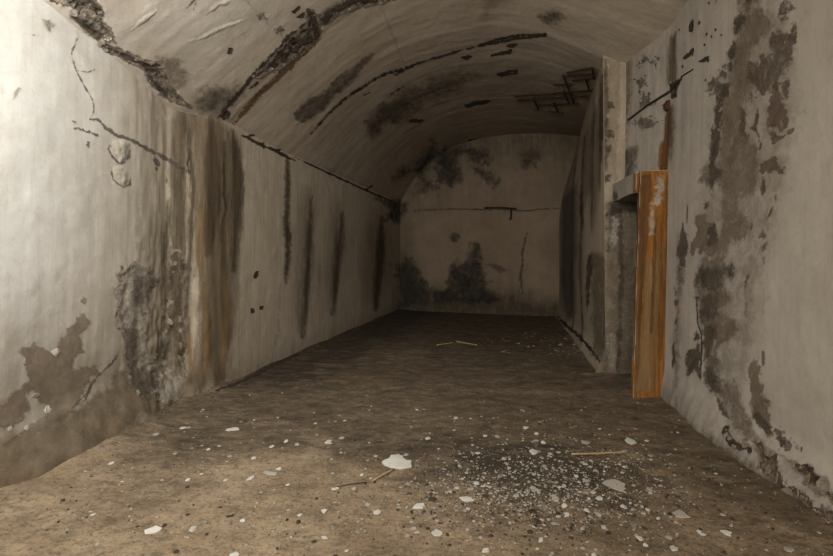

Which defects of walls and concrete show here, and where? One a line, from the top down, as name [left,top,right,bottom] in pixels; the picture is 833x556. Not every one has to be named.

spalling [50,0,193,109]
crack [71,40,190,183]
spalling [252,0,396,79]
spalling [477,33,547,57]
damp [161,89,243,389]
crack [219,155,227,241]
damp [283,160,291,278]
damp [396,244,505,307]
corrosion [632,108,673,398]
damp [694,0,770,441]
peeling [0,314,98,438]
peeling [722,351,833,526]